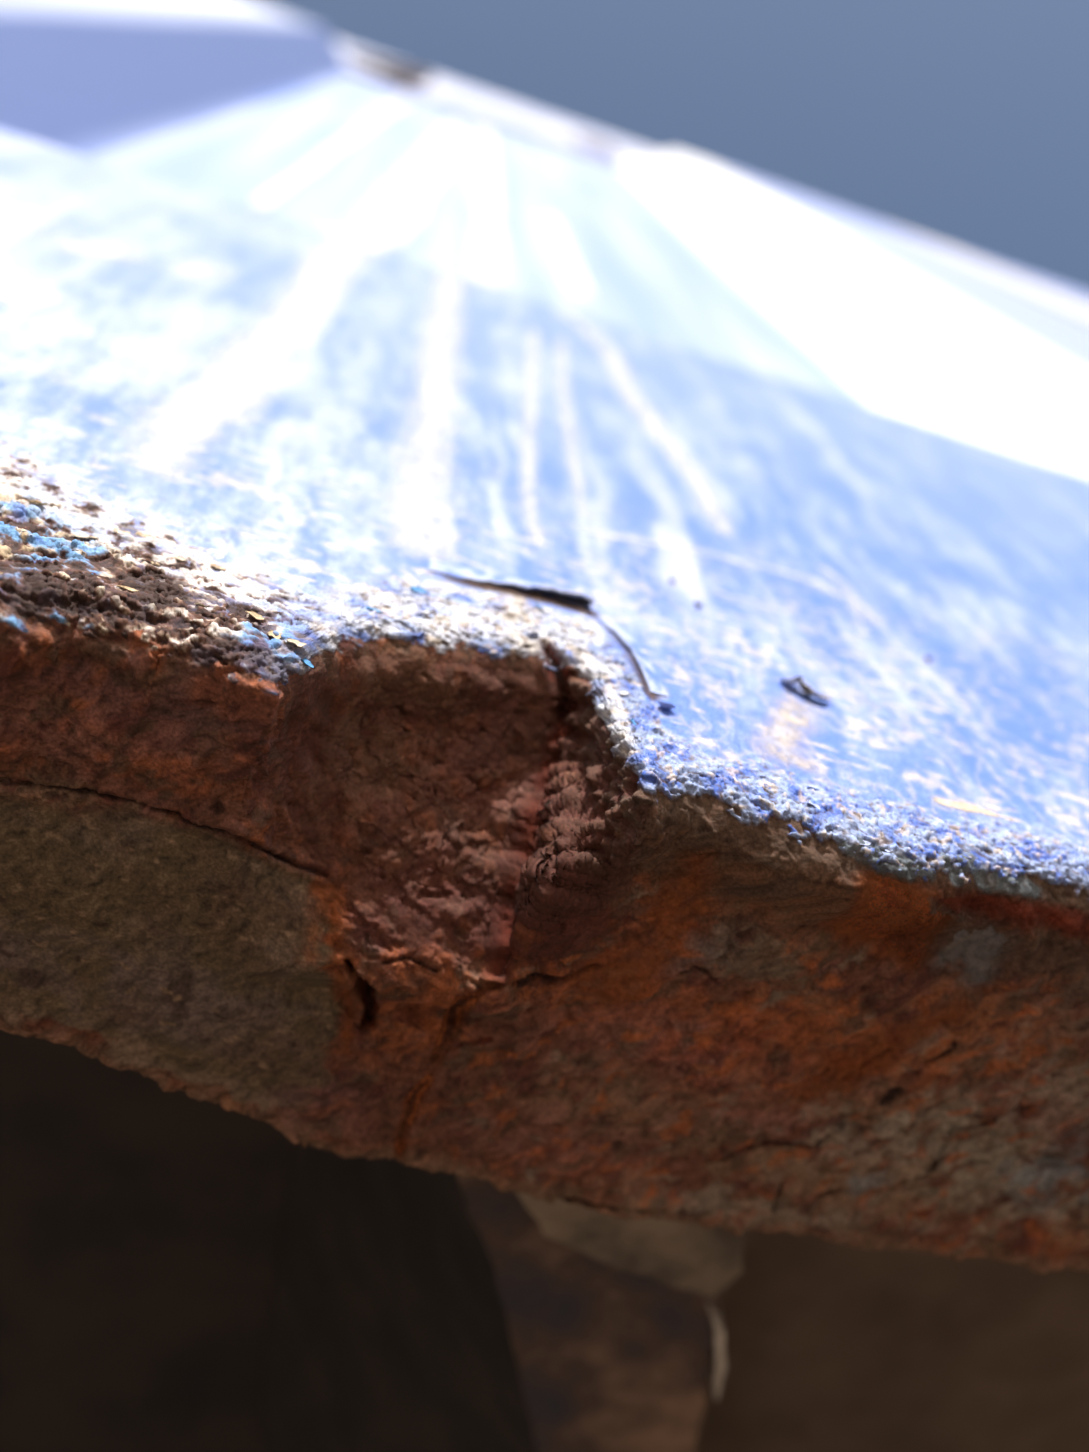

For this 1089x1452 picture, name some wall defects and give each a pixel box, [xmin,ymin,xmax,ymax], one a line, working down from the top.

peeling [0,441,1089,898]
crack [542,646,567,682]
crack [46,786,318,876]
crack [348,923,599,1156]